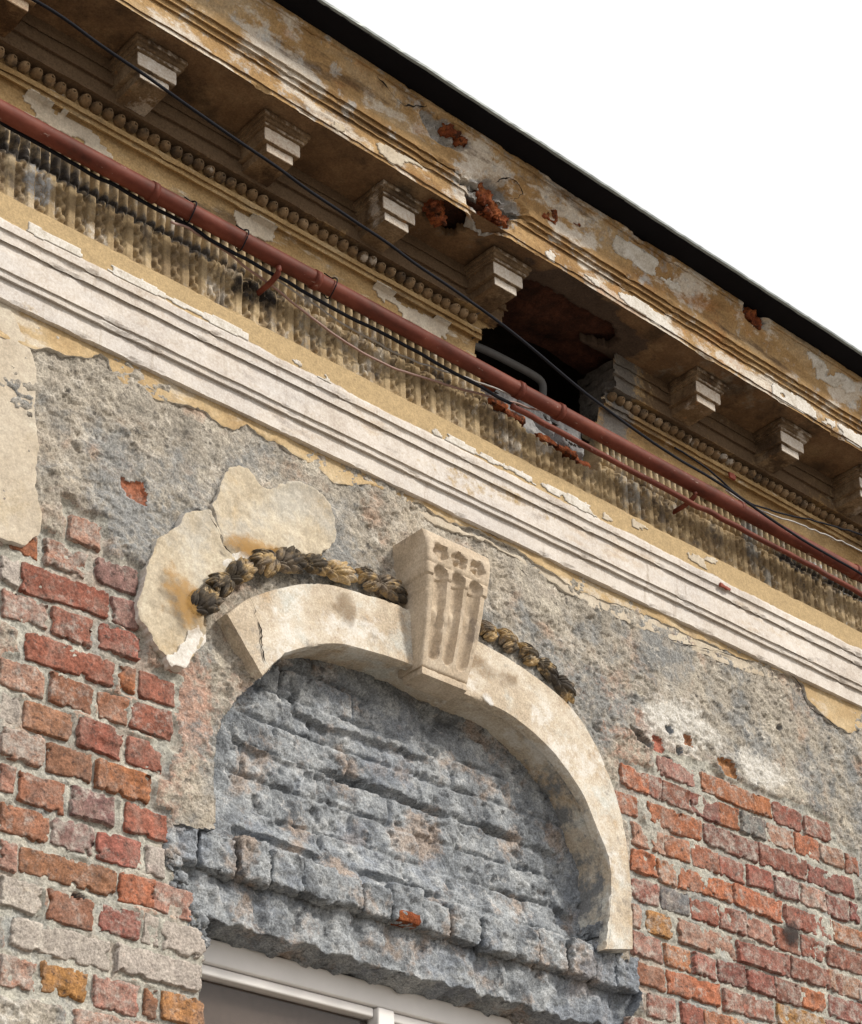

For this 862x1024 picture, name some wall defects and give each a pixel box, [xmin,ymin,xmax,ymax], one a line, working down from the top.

peeling [22,88,113,159]
peeling [26,222,83,258]
peeling [233,210,278,242]
spalling [472,182,510,229]
peeling [107,265,249,341]
peeling [372,280,451,340]
spalling [742,307,762,330]
flaking render [396,492,862,733]
flaking render [0,302,384,1024]
flaking render [577,734,862,1024]